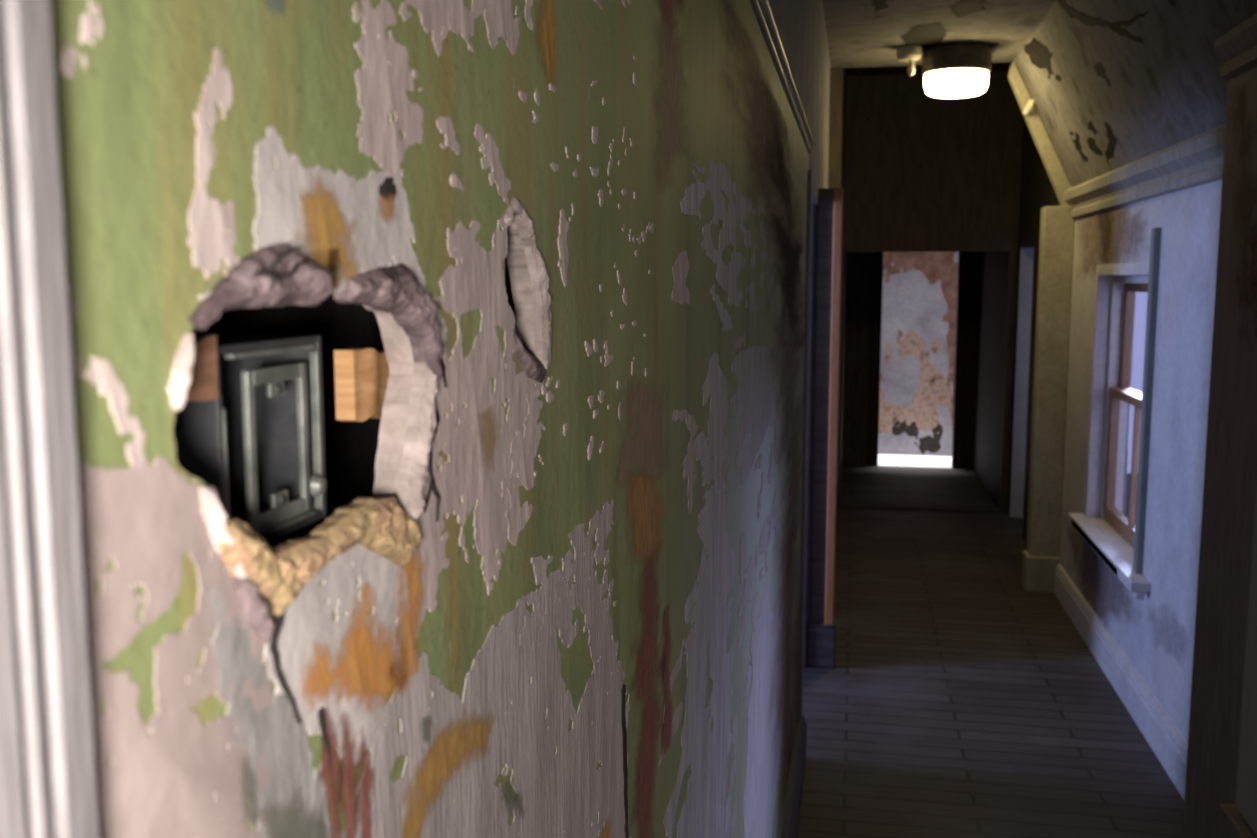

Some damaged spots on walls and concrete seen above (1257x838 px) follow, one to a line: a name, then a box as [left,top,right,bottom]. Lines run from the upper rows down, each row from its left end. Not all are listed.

peeling [58,0,105,78]
peeling [1024,37,1061,82]
peeling [1070,120,1117,165]
peeling [67,0,637,838]
peeling [879,252,958,454]
crack [269,609,330,771]